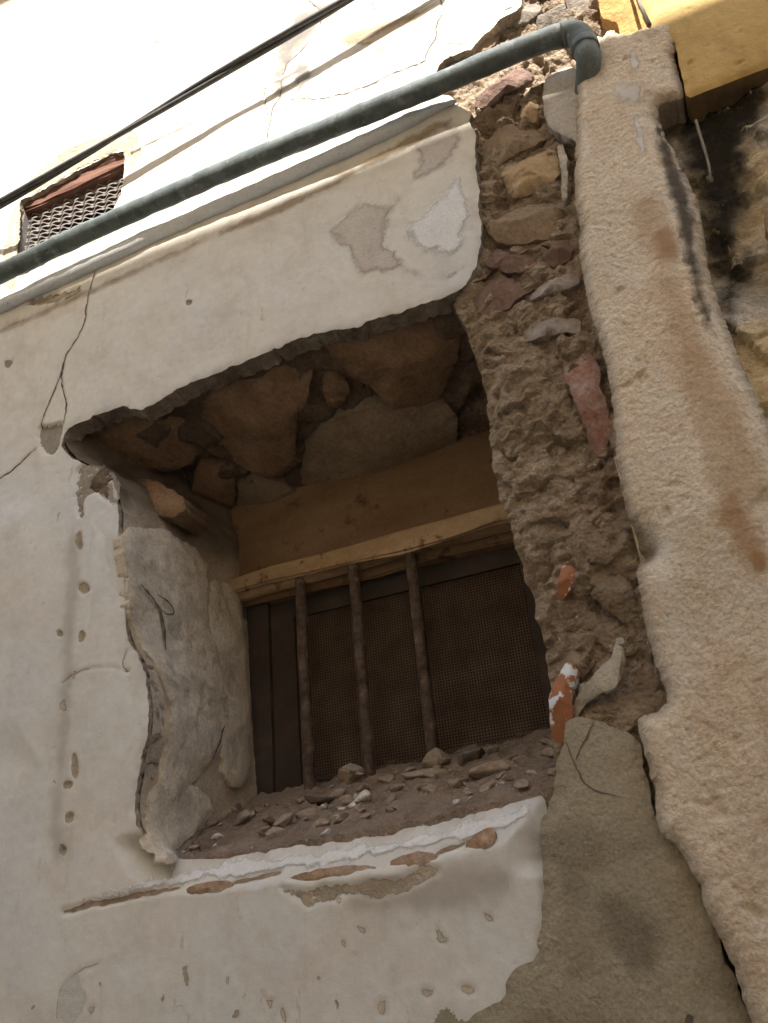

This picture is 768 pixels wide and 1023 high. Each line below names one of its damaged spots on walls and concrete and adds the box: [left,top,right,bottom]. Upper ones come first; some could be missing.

spalling [441,0,607,66]
crack [264,0,443,141]
peeling [414,124,458,178]
peeling [331,204,399,273]
peeling [407,178,469,254]
damp [656,86,768,321]
crack [0,271,95,479]
spalling [444,49,667,808]
spalling [76,464,121,518]
spalling [53,753,79,790]
spalling [283,865,438,907]
peeling [434,1009,468,1023]